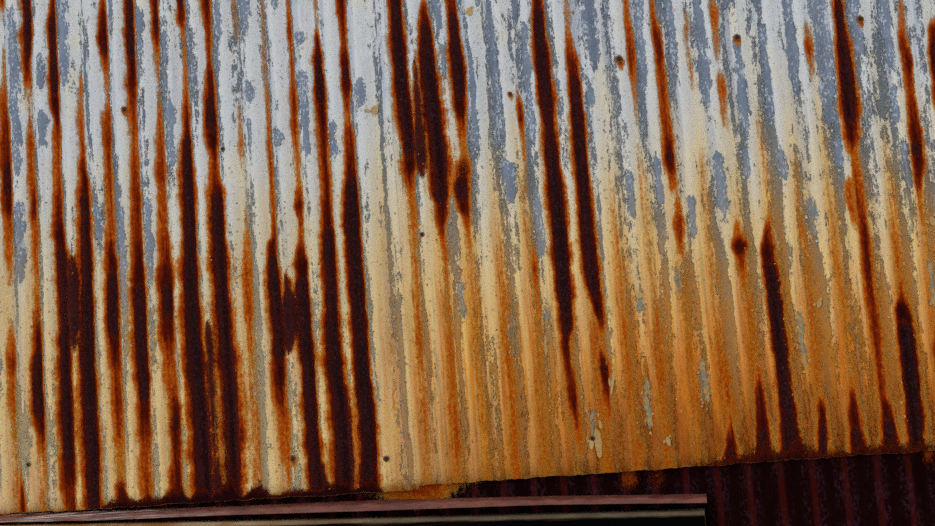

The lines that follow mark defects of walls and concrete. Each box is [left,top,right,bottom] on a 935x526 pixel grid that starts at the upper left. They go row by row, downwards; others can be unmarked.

corrosion [0,48,14,286]
peeling [57,0,72,90]
peeling [117,205,132,362]
corrosion [16,0,495,511]
peeling [463,0,519,209]
corrosion [507,89,556,477]
peeling [580,0,601,111]
corrosion [530,0,677,493]
peeling [690,0,713,111]
corrosion [649,0,935,526]
peeling [807,0,845,171]
corrosion [5,325,28,513]